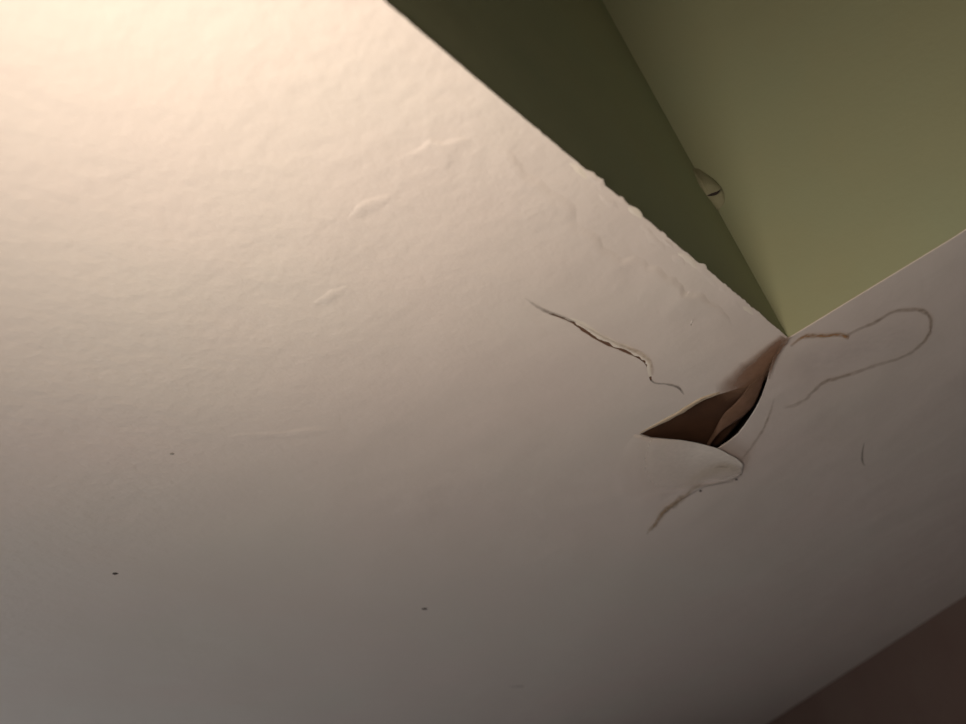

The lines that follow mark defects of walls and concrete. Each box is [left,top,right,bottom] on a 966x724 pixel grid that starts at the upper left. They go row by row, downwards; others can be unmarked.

crack [549,313,652,381]
flaking render [613,364,771,527]